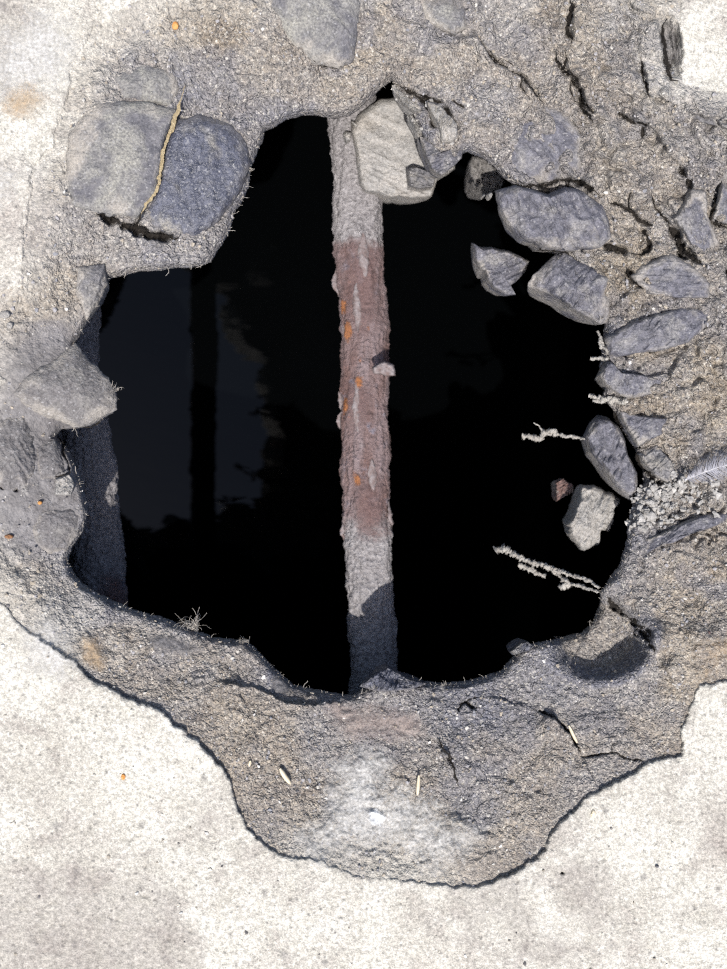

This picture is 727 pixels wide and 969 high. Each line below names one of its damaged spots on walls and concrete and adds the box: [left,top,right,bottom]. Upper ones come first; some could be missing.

crack [96,89,184,241]
peeling [392,85,421,116]
peeling [407,115,429,172]
peeling [426,100,458,144]
crack [480,39,545,104]
crack [555,0,594,124]
crack [640,58,650,98]
spalling [659,19,684,81]
crack [517,177,703,289]
crack [711,181,727,227]
corrosion [327,95,398,695]
spalling [602,387,623,399]